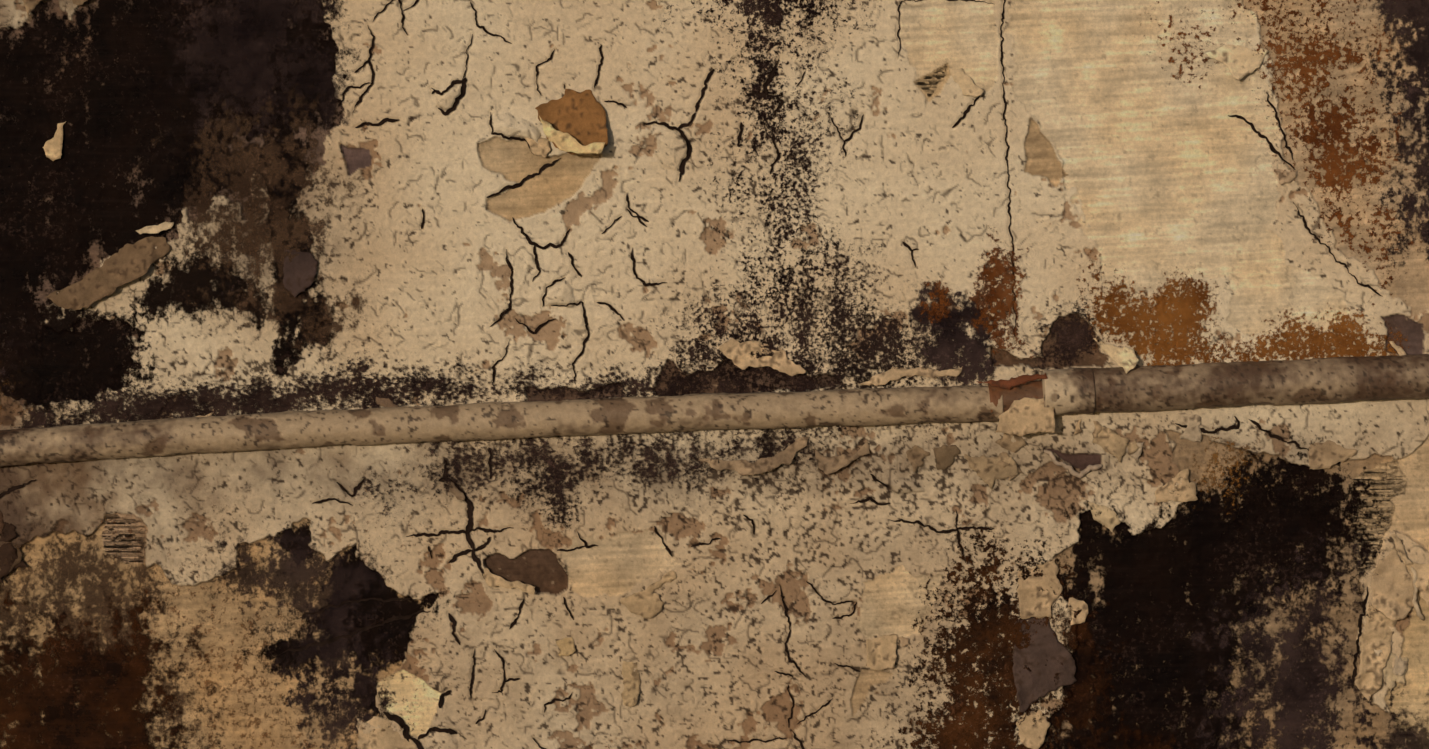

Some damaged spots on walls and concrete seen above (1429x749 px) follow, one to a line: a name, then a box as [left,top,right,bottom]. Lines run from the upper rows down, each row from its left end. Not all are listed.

peeling [22,144,253,368]
crack [338,0,419,128]
leakage [0,0,1011,428]
crack [431,2,715,385]
crack [897,0,1017,345]
rust [919,228,1034,358]
rust [1076,0,1424,366]
peeling [0,511,441,749]
crack [274,597,524,749]
crack [406,448,512,578]
peeling [1012,502,1121,749]
peeling [1136,413,1429,749]